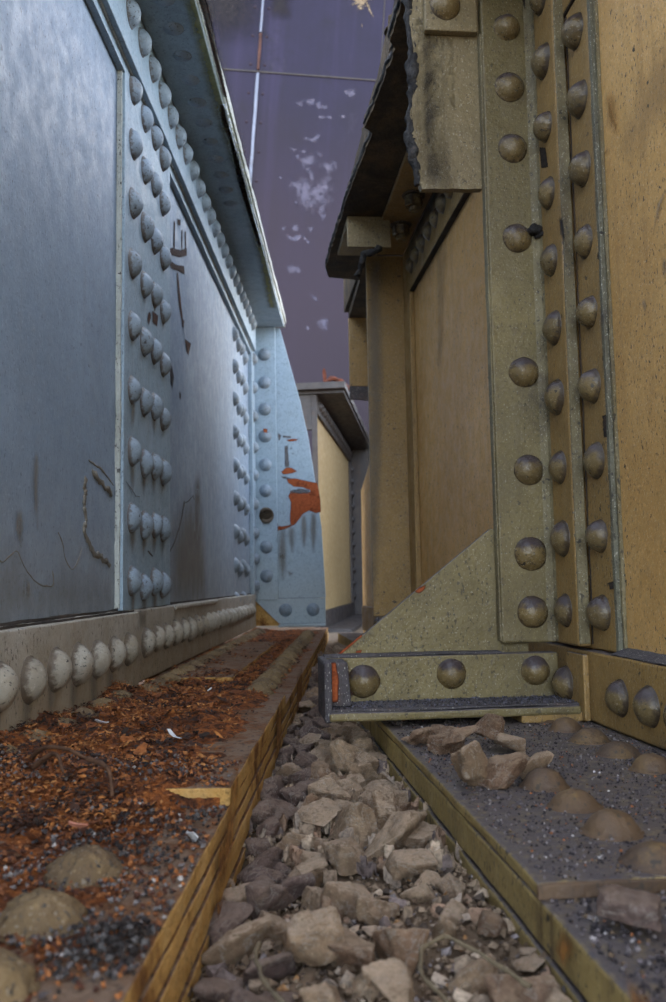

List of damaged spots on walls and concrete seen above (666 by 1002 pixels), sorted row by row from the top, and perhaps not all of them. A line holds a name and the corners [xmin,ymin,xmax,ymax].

corrosion [170,219,191,355]
peeling [277,433,321,530]